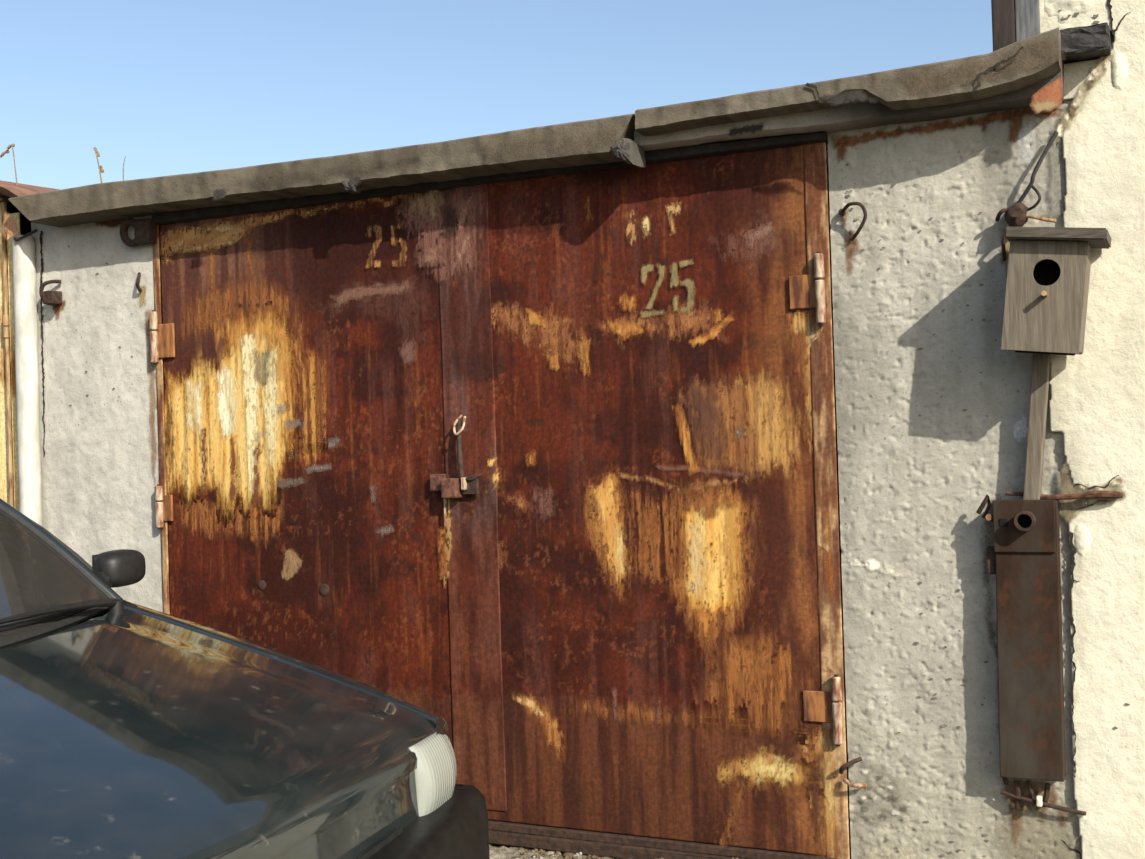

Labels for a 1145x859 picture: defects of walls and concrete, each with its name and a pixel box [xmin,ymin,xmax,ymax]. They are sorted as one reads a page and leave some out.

crack [972,46,1024,91]
spalling [1032,50,1113,141]
corrosion [833,108,1060,160]
corrosion [4,213,18,237]
corrosion [841,210,858,271]
corrosion [180,226,326,466]
corrosion [175,490,284,548]
corrosion [507,489,553,515]
corrosion [569,468,814,736]
corrosion [517,696,564,756]
crack [1061,839,1082,859]